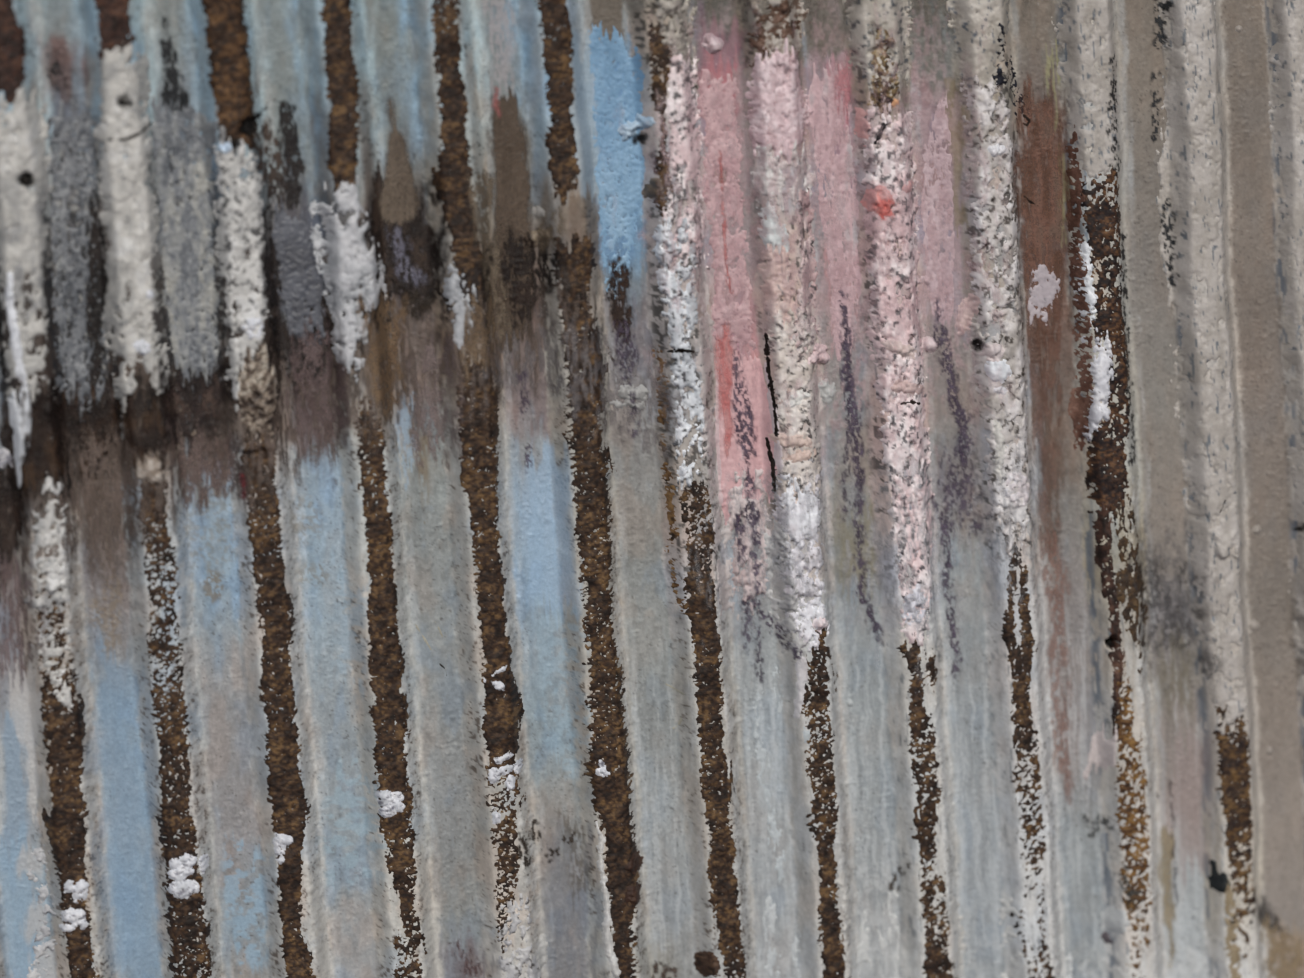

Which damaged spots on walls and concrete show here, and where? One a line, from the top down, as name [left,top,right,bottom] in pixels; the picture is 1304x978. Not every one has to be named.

rust [428,0,490,311]
rust [534,0,581,206]
rust [34,570,100,978]
rust [136,480,213,978]
rust [240,426,316,978]
rust [353,393,427,978]
rust [454,350,526,953]
rust [548,229,677,978]
rust [652,346,747,978]
rust [800,628,852,978]
rust [896,632,958,978]
rust [1001,76,1175,978]